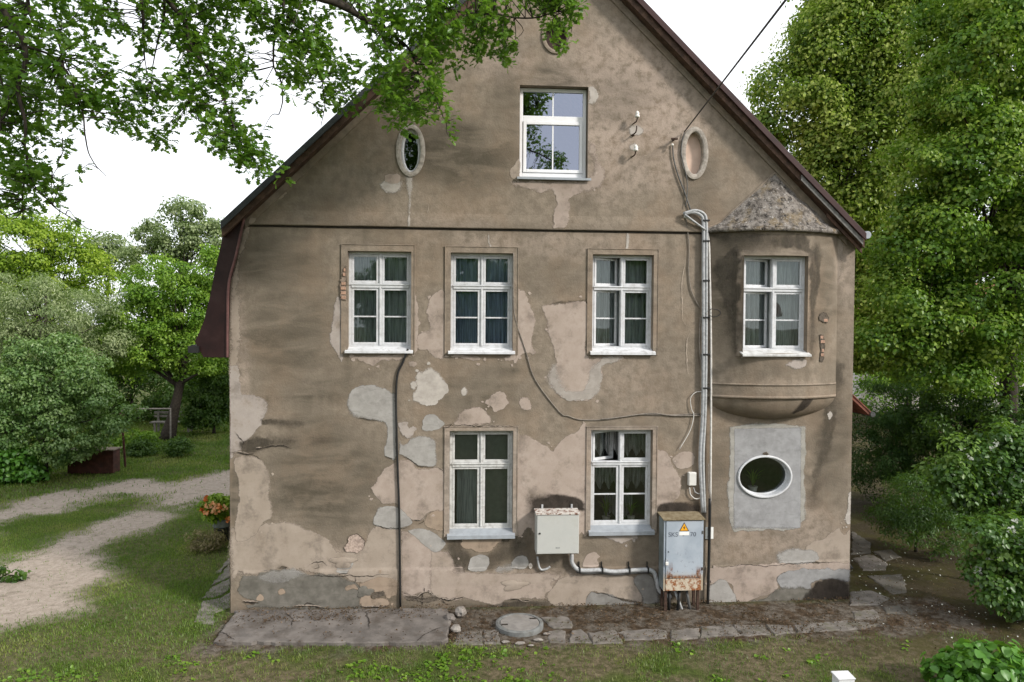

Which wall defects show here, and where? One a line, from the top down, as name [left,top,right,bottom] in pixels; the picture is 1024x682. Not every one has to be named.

peeling [510,142,605,228]
peeling [349,284,625,403]
peeling [229,456,644,608]
peeling [705,492,851,602]
leakage [804,578,849,600]